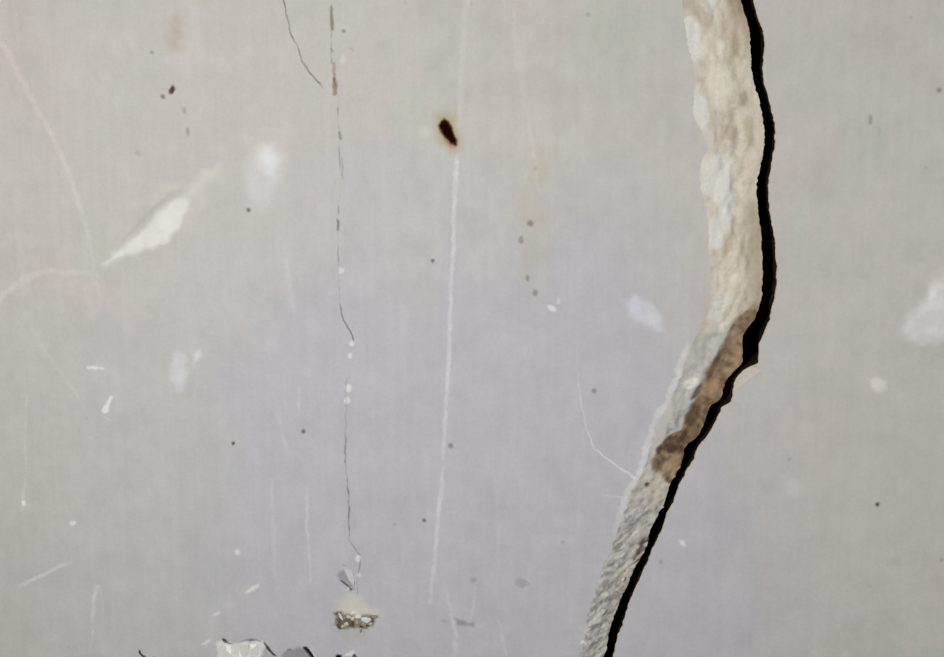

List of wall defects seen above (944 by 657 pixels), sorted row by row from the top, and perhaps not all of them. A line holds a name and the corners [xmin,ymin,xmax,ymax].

corrosion [439,119,457,146]
crack [578,0,778,657]
spalling [335,611,377,633]
peeling [219,639,274,657]